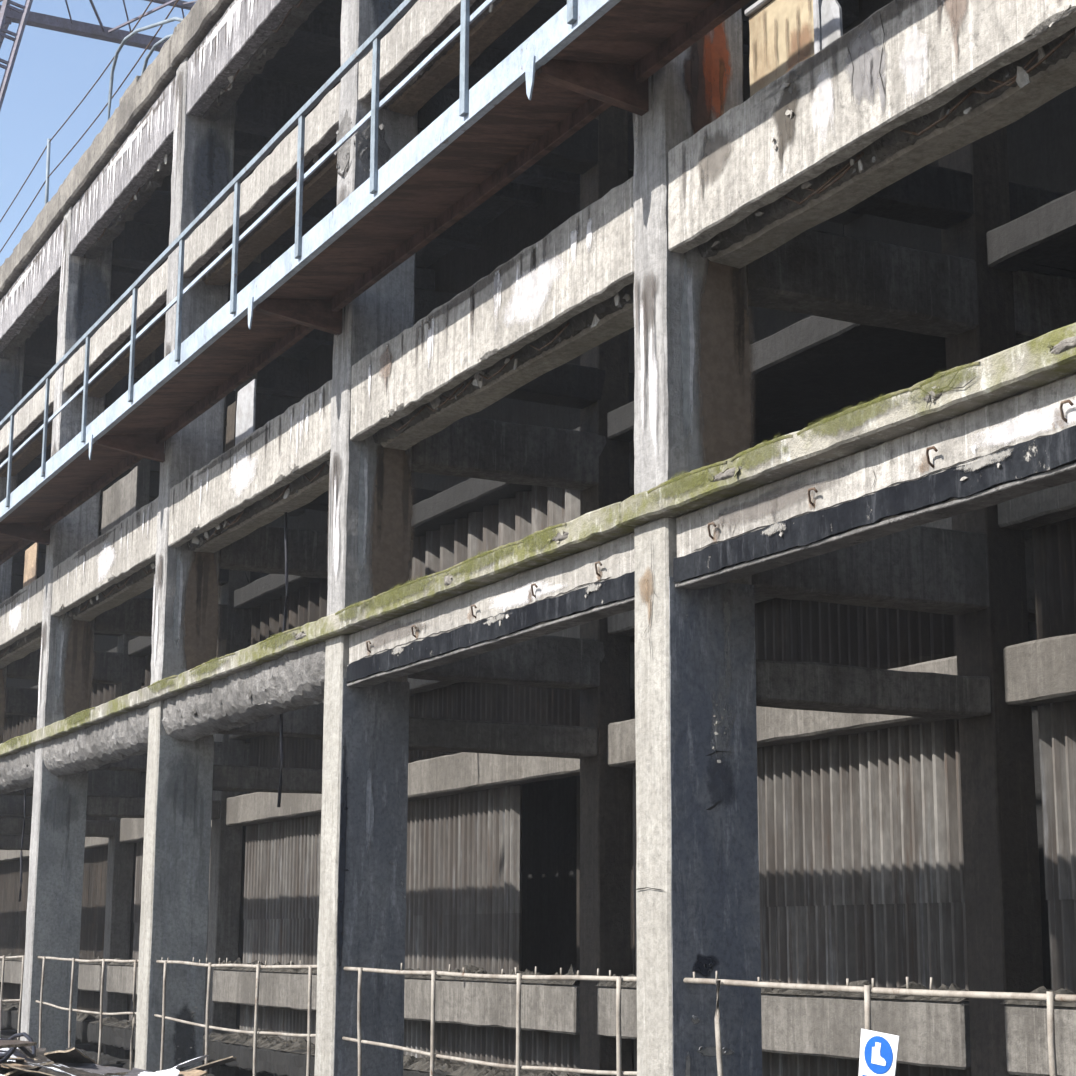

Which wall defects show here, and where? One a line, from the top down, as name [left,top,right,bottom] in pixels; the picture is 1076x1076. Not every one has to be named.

rust [703,21,731,118]
water stain [1,0,258,322]
spalling [697,5,1076,259]
water stain [0,366,20,430]
water stain [74,265,109,347]
water stain [57,503,152,585]
water stain [173,387,325,511]
spalling [373,282,634,445]
water stain [635,275,656,434]
water stain [681,258,753,466]
water stain [715,482,824,535]
water stain [39,617,95,718]